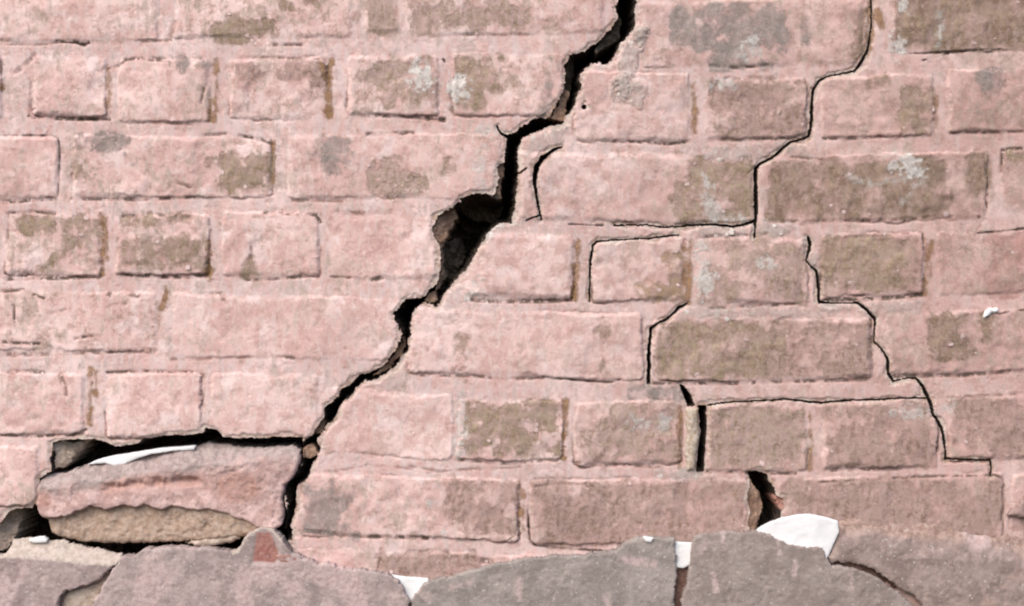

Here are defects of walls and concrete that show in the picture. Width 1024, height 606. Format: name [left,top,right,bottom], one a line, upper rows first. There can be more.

crack [571,0,872,302]
crack [0,0,637,572]
crack [646,302,688,385]
crack [679,236,992,477]
spalling [186,536,242,546]